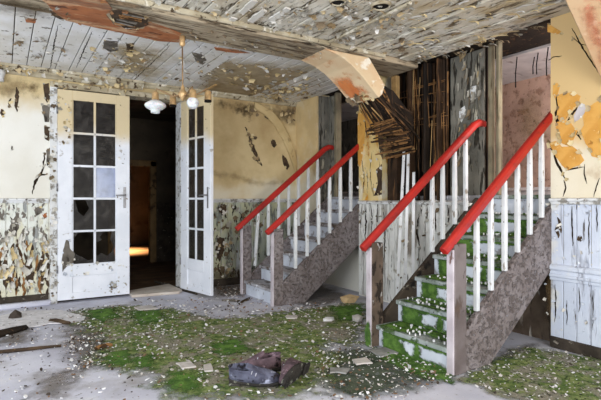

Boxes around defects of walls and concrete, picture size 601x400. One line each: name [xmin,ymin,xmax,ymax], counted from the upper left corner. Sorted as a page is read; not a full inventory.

peeling [0,0,323,183]
peeling [188,0,568,132]
peeling [547,83,601,171]
crack [571,29,598,72]
crack [32,152,47,194]
peeling [0,198,124,297]
peeling [213,204,263,277]
spalling [546,203,592,239]